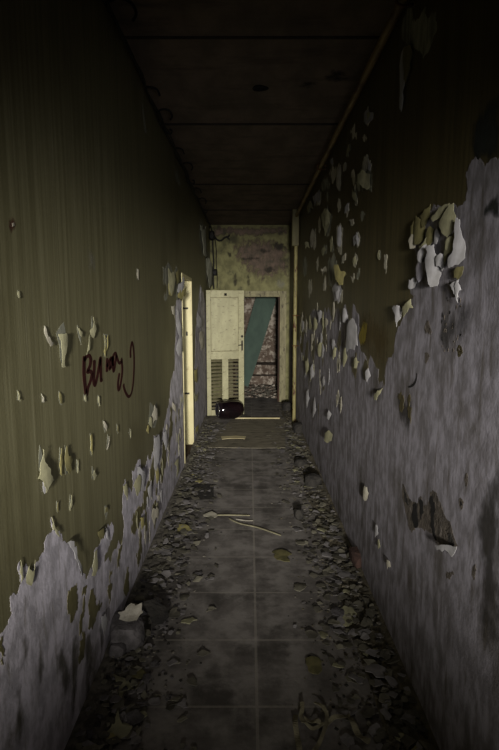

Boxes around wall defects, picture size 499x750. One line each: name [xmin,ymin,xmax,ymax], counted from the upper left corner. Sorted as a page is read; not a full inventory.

peeling [0,263,186,750]
peeling [289,109,499,750]